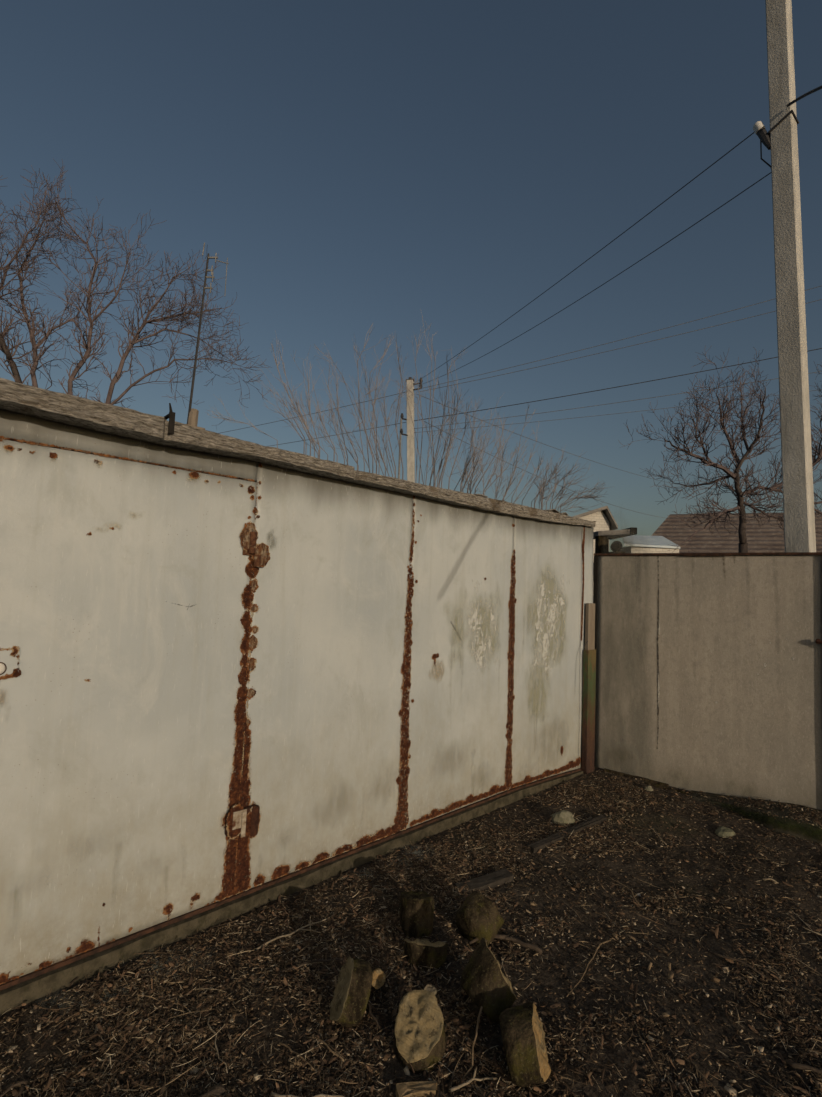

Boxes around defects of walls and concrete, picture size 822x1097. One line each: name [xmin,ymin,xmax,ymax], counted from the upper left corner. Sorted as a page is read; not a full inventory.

rust [0,436,581,909]
rust [162,902,173,920]
rust [0,939,116,985]